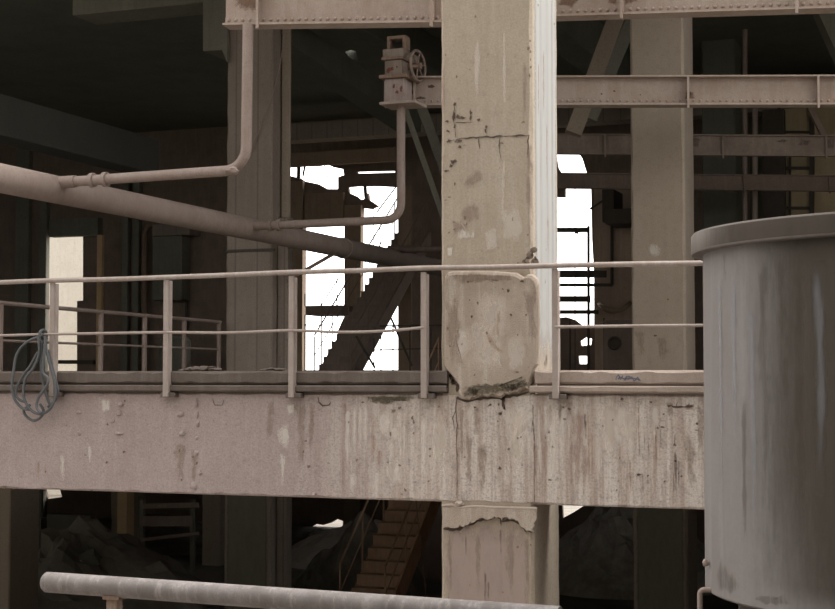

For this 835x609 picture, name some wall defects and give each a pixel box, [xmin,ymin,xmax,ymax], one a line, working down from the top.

crack [454,107,529,157]
damp [368,396,413,404]
crack [448,374,532,470]